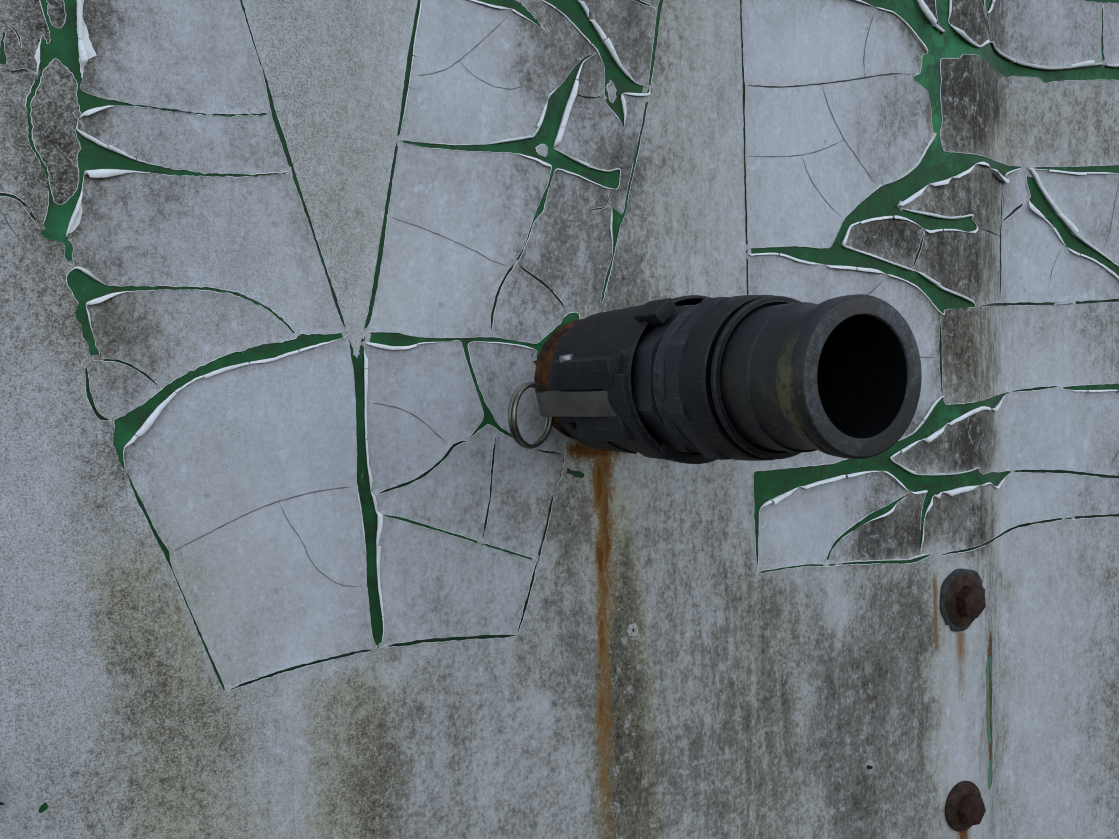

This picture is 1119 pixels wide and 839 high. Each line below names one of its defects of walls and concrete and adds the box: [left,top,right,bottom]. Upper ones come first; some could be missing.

peeling [746,0,1119,322]
peeling [0,0,656,654]
corrosion [565,442,620,804]
peeling [748,386,1013,576]
corrosion [957,633,965,660]